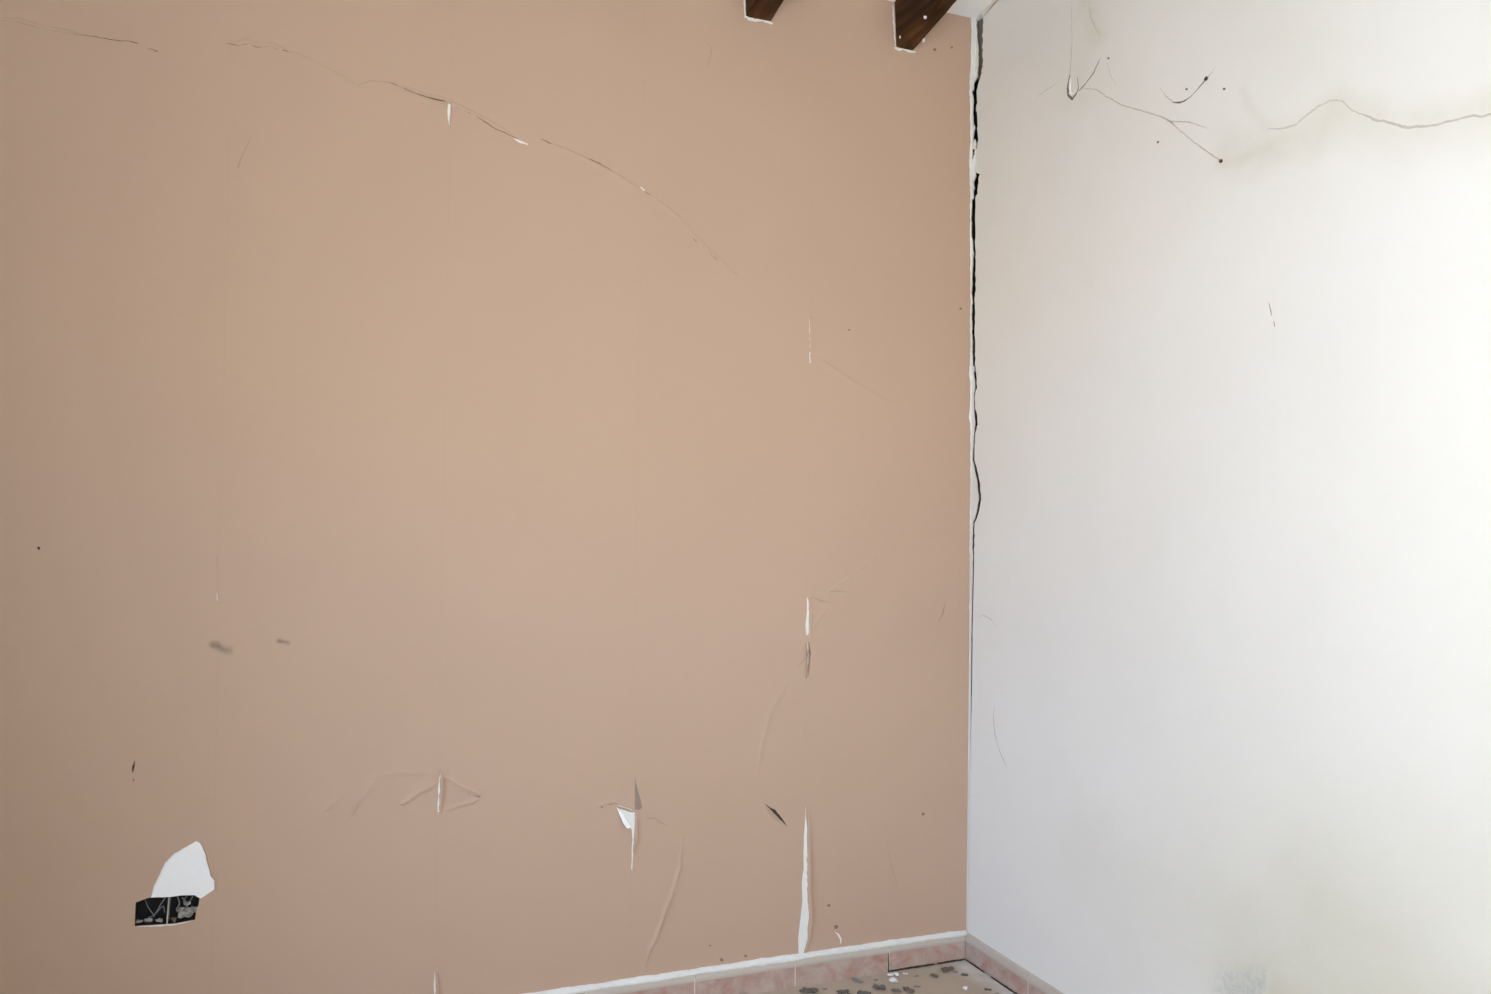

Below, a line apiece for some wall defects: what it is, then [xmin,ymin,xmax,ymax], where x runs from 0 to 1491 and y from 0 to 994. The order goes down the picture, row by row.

crack [1037,7,1223,163]
crack [1267,99,1491,130]
crack [958,0,998,959]
flaking render [617,805,635,869]
flaking render [151,842,214,899]
flaking render [798,808,809,954]
peeling [1203,948,1283,994]